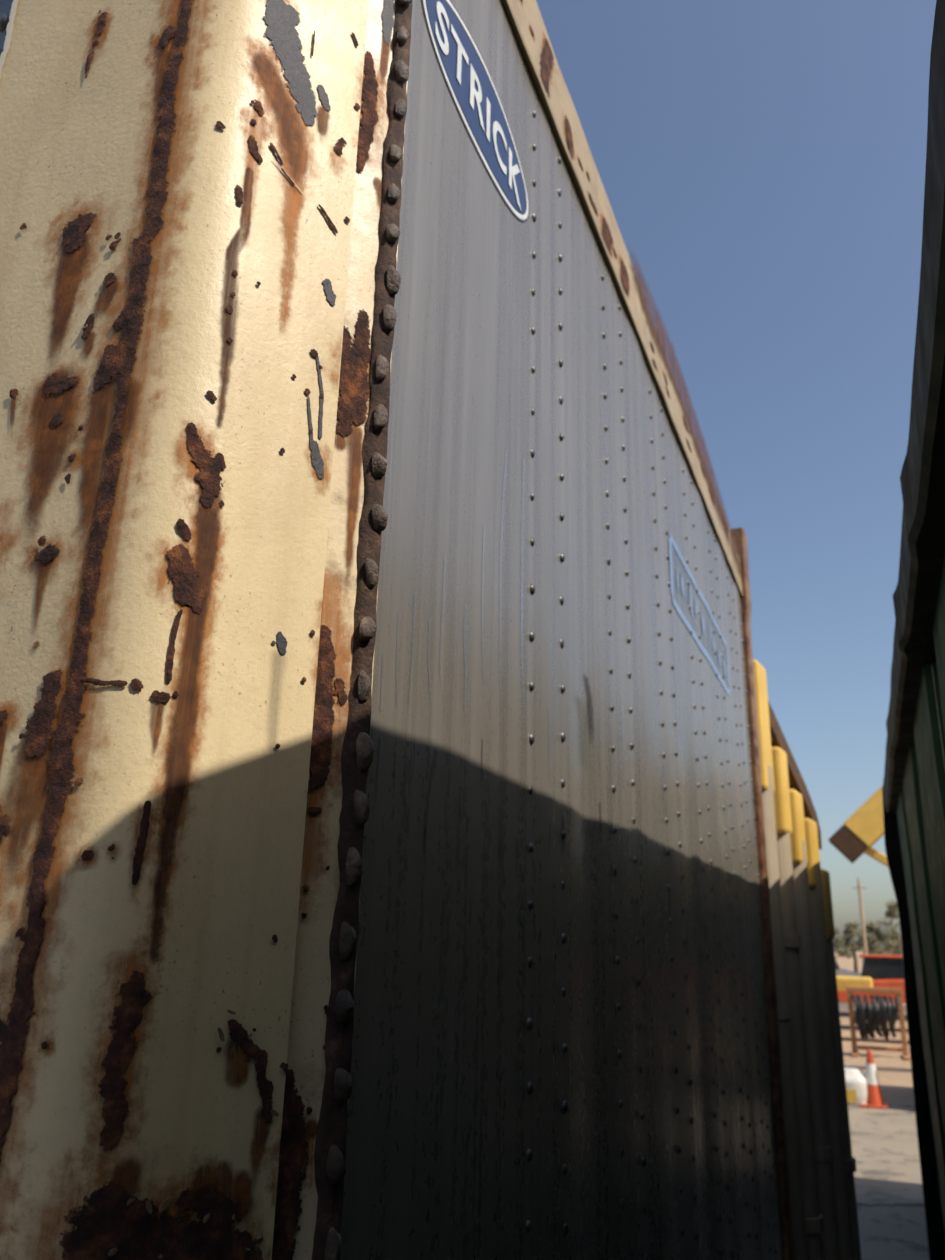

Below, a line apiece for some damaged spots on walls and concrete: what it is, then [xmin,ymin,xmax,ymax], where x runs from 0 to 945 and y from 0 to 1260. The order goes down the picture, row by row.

peeling [235,0,347,324]
corrosion [355,0,395,206]
corrosion [530,25,555,96]
corrosion [564,116,741,573]
corrosion [9,367,84,649]
corrosion [36,167,318,1260]
corrosion [302,309,371,892]